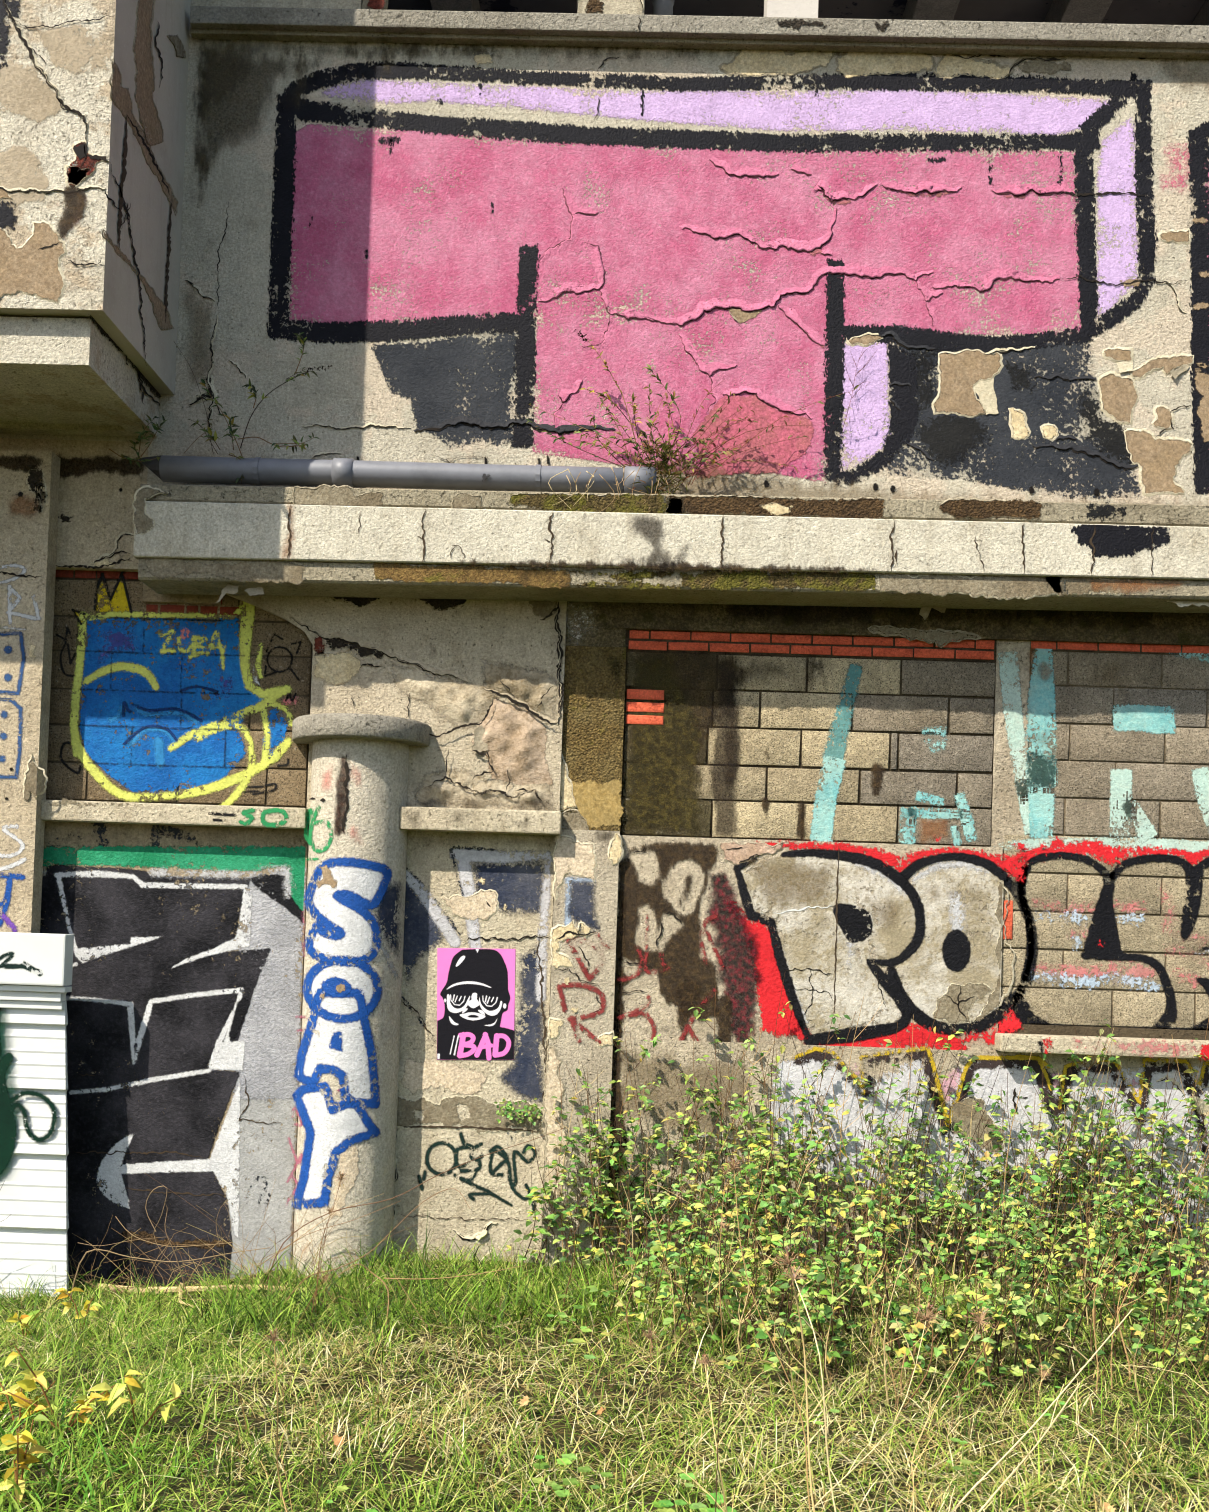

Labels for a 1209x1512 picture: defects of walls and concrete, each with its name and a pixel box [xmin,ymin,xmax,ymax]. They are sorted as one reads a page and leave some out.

peeling [109,0,186,216]
spalling [367,0,385,9]
crack [594,0,644,119]
spalling [0,220,67,304]
crack [0,0,247,435]
peeling [101,229,174,331]
peeling [509,156,1071,520]
spalling [1157,217,1208,245]
spalling [847,330,1209,497]
spalling [311,634,383,686]
crack [289,602,564,805]